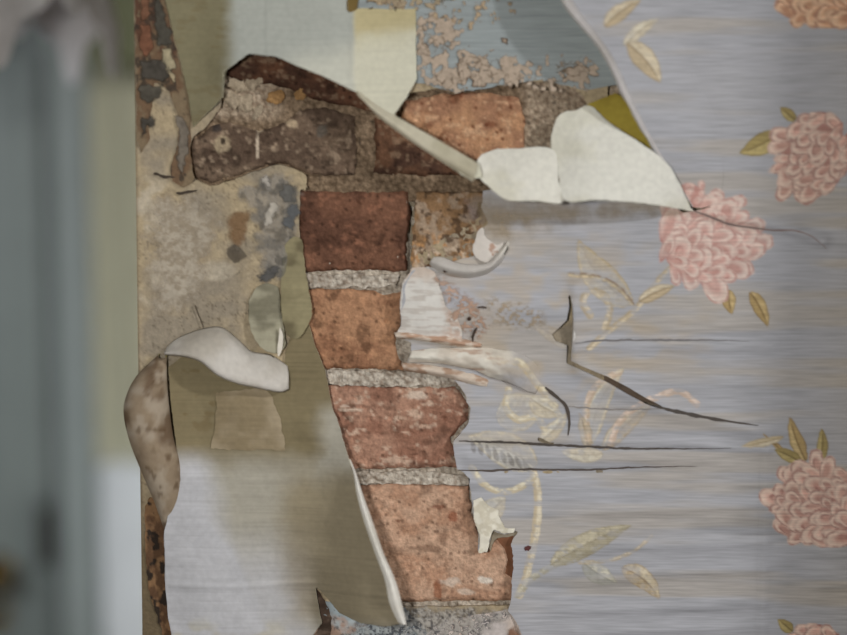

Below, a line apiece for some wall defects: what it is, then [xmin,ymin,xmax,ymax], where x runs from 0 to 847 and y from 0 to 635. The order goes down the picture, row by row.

flaking render [347,0,599,162]
peeling [124,0,514,635]
crack [545,375,759,435]
crack [570,296,750,357]